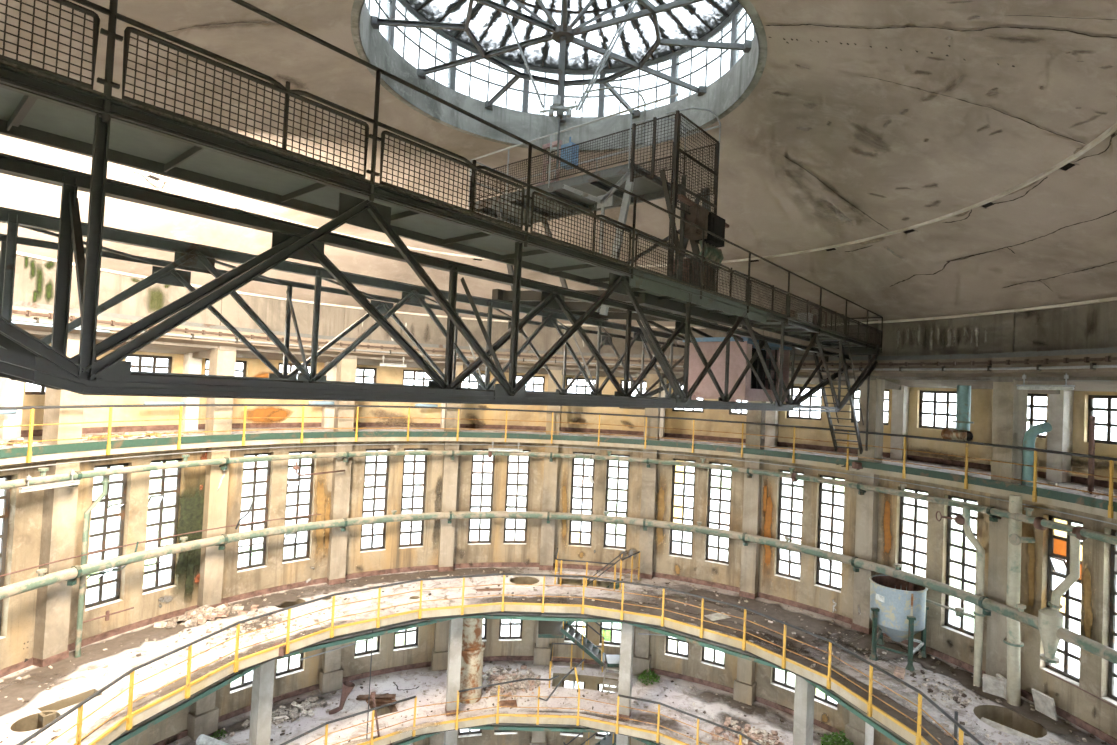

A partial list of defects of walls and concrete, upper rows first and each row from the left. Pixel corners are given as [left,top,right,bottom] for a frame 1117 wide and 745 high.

crack [765,15,1117,39]
crack [859,75,1117,162]
crack [784,156,886,252]
crack [945,177,1047,223]
crack [890,210,1117,291]
damp [174,478,205,596]
corrosion [314,478,331,554]
corrosion [763,483,773,573]
corrosion [883,497,892,558]